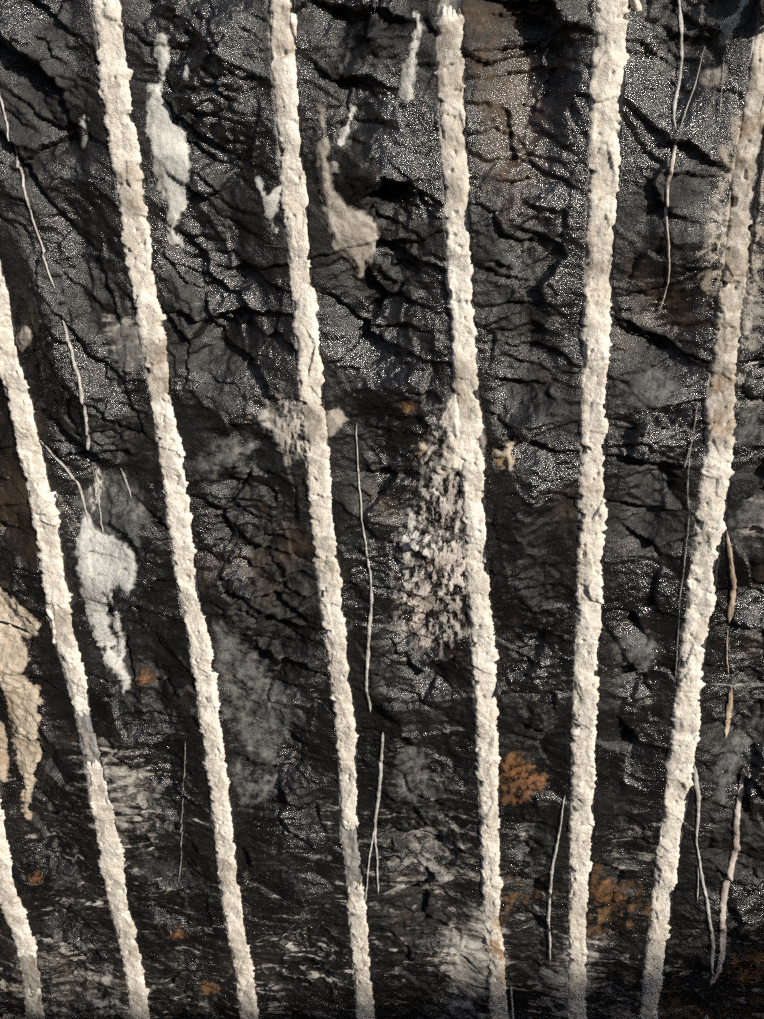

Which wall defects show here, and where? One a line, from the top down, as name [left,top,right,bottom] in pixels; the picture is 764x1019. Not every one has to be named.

leakage [717,0,749,47]
leakage [80,115,88,148]
leakage [145,33,191,248]
leakage [254,177,282,233]
leakage [316,104,380,278]
leakage [697,111,742,296]
leakage [740,139,764,351]
leakage [263,397,304,462]
leakage [325,409,348,437]
leakage [75,466,138,693]
leakage [394,415,467,650]
rust [498,753,548,806]